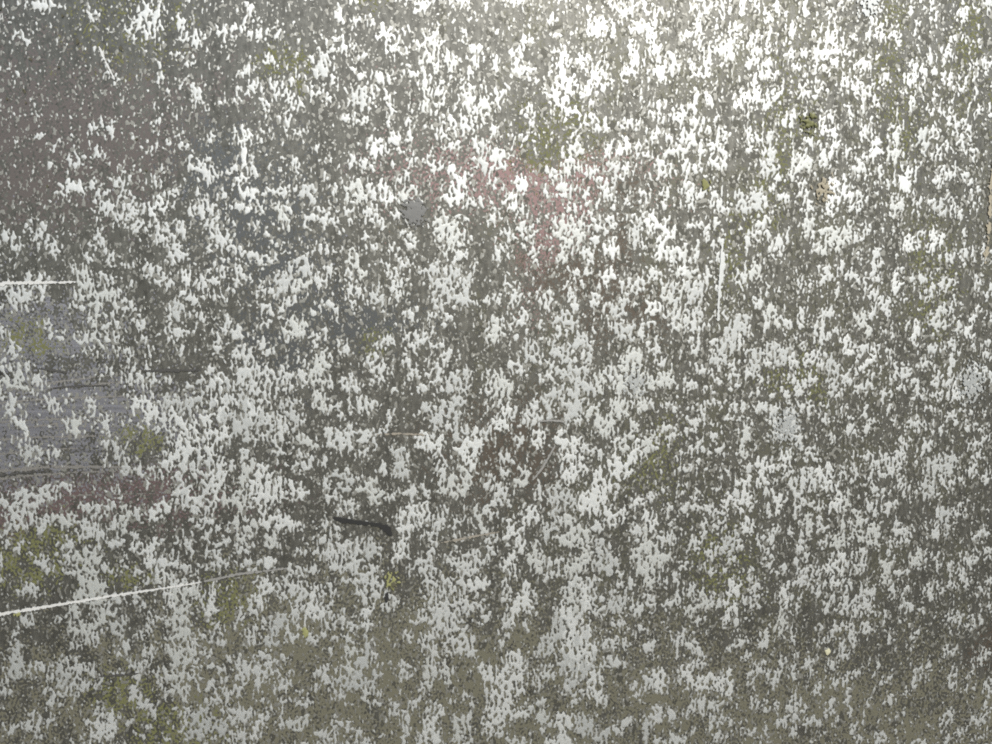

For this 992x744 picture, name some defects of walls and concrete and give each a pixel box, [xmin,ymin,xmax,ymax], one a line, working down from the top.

spalling [333,517,392,536]